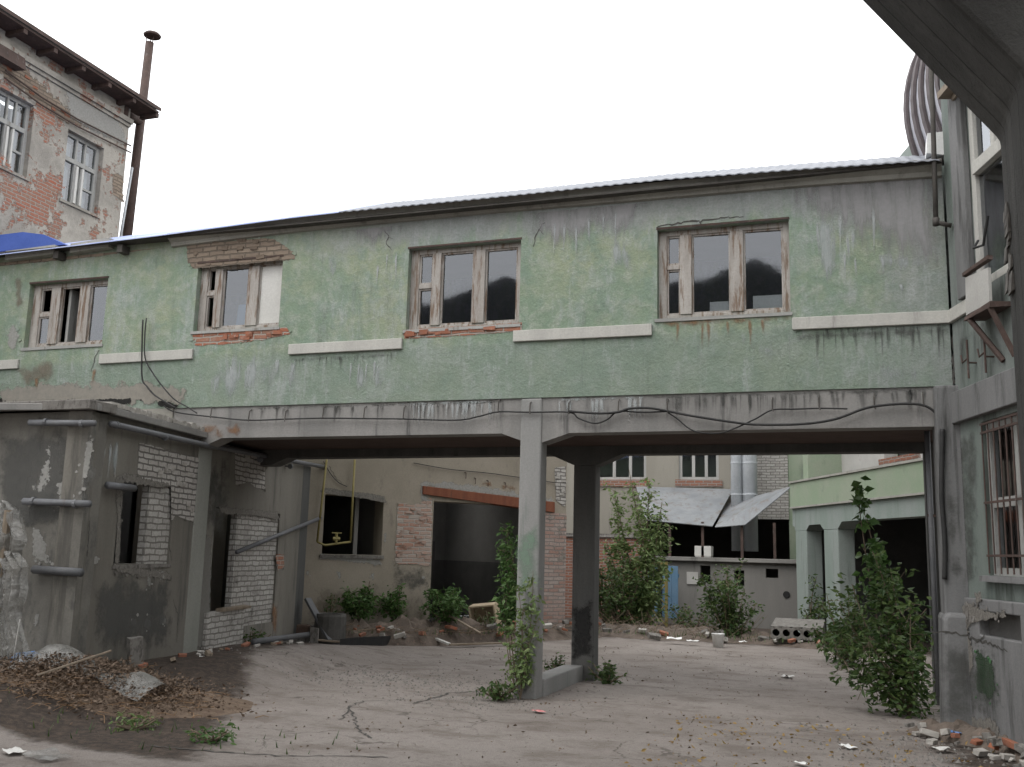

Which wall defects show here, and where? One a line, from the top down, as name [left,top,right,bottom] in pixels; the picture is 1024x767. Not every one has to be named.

flaking render [0,63,130,144]
flaking render [0,155,66,236]
flaking render [112,174,124,202]
flaking render [187,237,296,269]
flaking render [190,327,291,346]
damp [413,401,491,415]
peeling [32,435,94,507]
damp [97,577,170,645]
crack [932,631,1007,652]